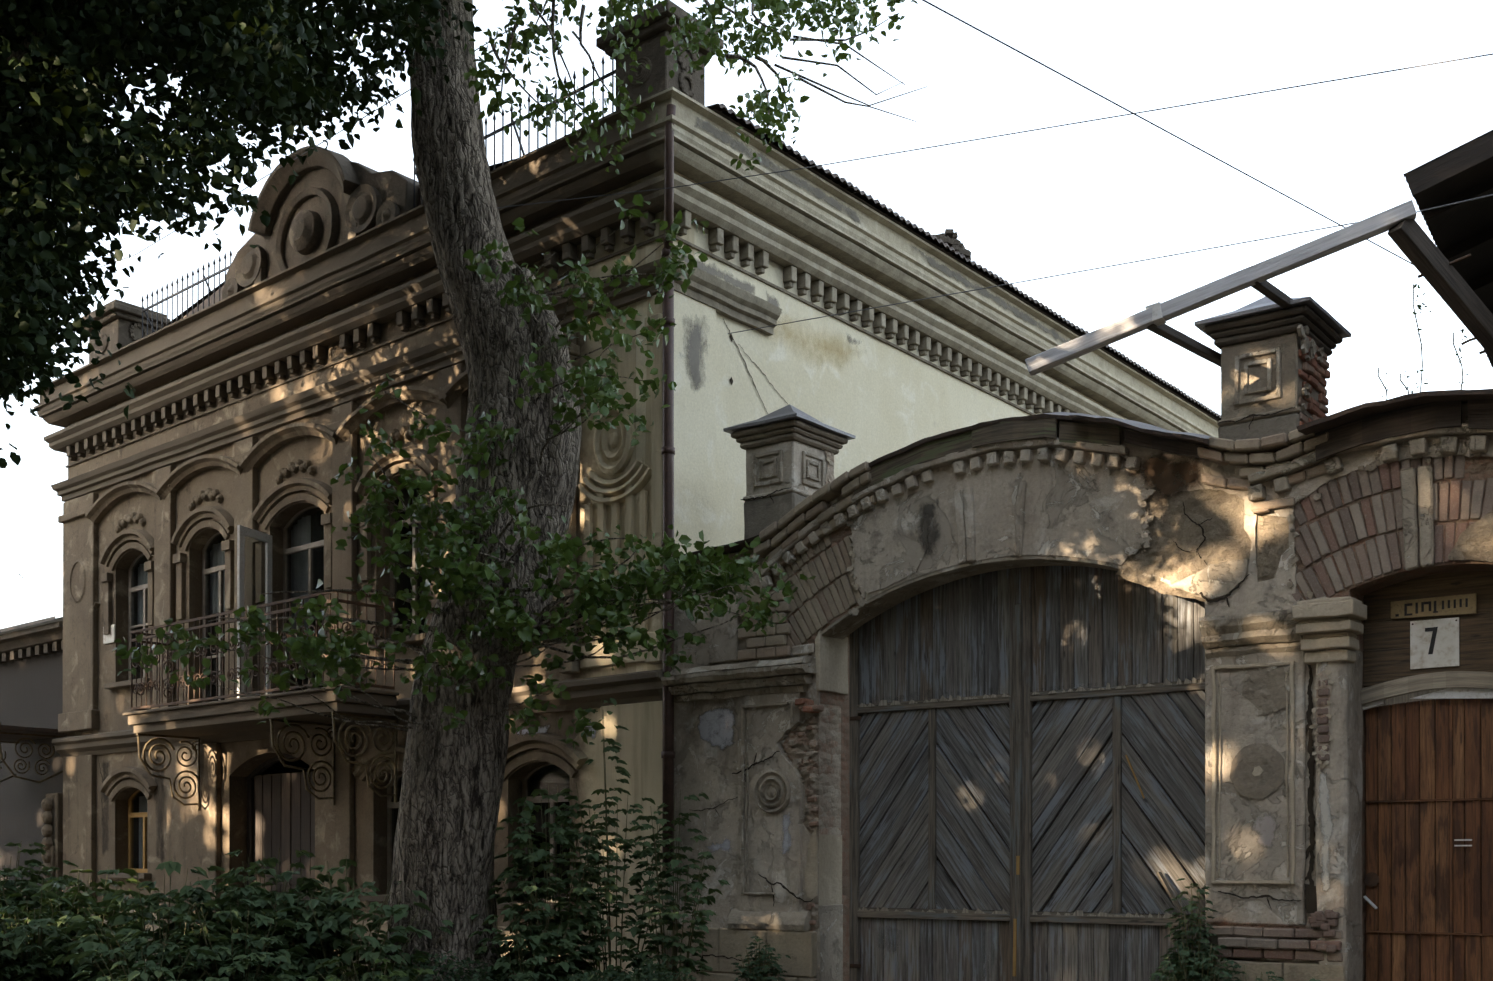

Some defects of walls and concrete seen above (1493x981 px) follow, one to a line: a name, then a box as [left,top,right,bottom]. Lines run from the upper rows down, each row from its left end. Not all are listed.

flaking render [1297,324,1331,426]
flaking render [1116,446,1493,602]
peeling [1309,662,1334,891]